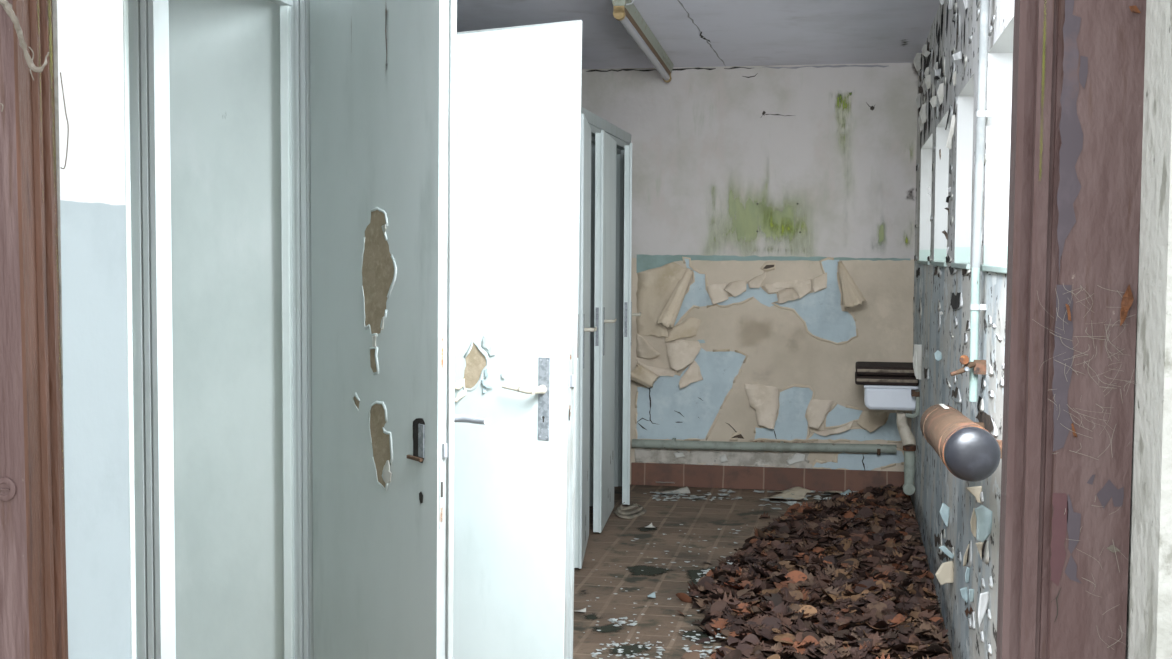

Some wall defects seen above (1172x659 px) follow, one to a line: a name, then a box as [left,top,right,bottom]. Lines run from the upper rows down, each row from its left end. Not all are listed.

crack [586,0,888,72]
peeling [913,0,995,279]
peeling [362,210,394,373]
peeling [938,292,970,344]
peeling [454,336,506,402]
peeling [631,257,904,470]
peeling [913,344,942,381]
peeling [946,375,961,403]
peeling [975,363,1004,437]
peeling [354,396,392,488]
peeling [934,486,993,655]